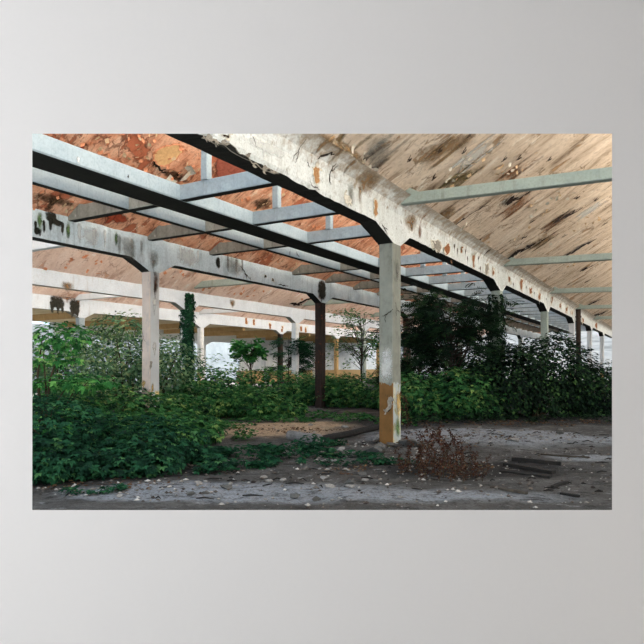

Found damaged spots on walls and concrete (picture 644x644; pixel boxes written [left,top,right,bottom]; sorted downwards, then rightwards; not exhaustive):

spalling [202,134,279,177]
crack [294,141,336,190]
leakage [424,134,472,168]
leakage [440,143,493,188]
leakage [495,159,533,182]
leakage [34,194,73,237]
leakage [501,195,532,220]
leakage [529,211,568,252]
leakage [50,296,80,317]
leakage [318,281,326,303]
spalling [383,395,400,414]